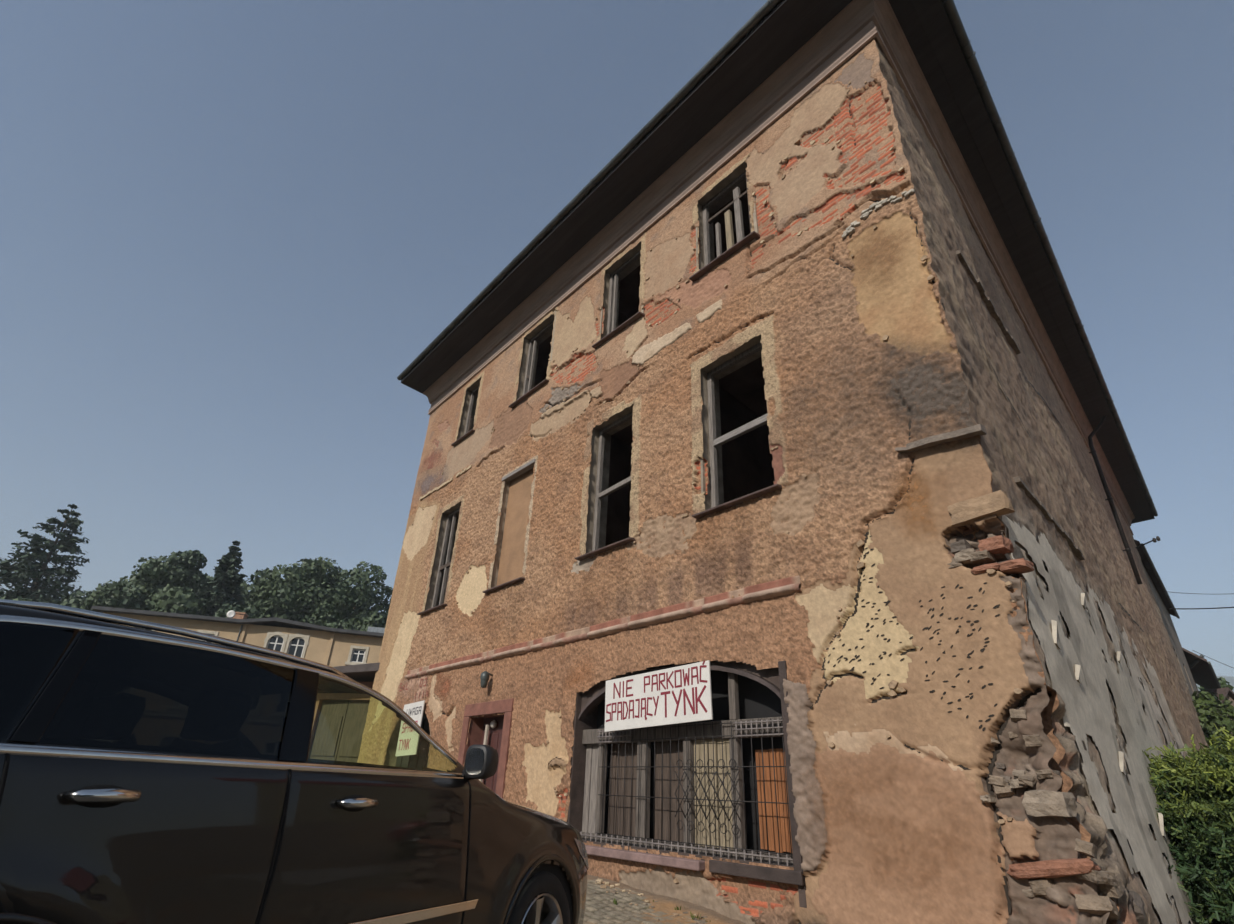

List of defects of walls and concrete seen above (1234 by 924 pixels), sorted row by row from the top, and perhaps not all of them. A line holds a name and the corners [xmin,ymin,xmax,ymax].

spalling [745,81,906,269]
spalling [530,227,731,442]
spalling [369,611,420,731]
spalling [402,504,437,560]
spalling [456,565,488,616]
spalling [522,710,570,818]
crack [810,393,915,709]
spalling [619,435,1195,924]